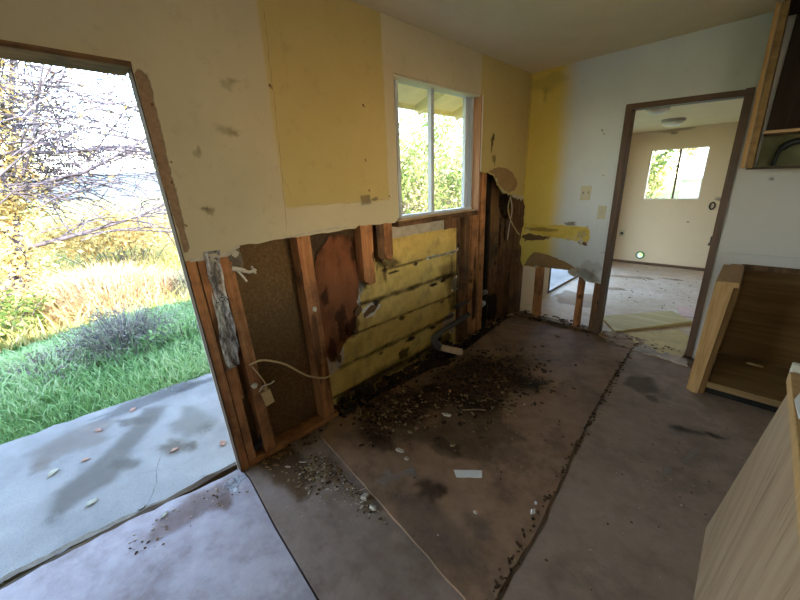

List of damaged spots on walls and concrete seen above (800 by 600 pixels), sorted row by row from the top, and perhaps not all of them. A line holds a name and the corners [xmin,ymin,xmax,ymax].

water stain [313,230,355,251]
peeling [524,223,590,246]
spalling [357,280,380,318]
water stain [54,378,213,512]
spalling [0,496,171,583]